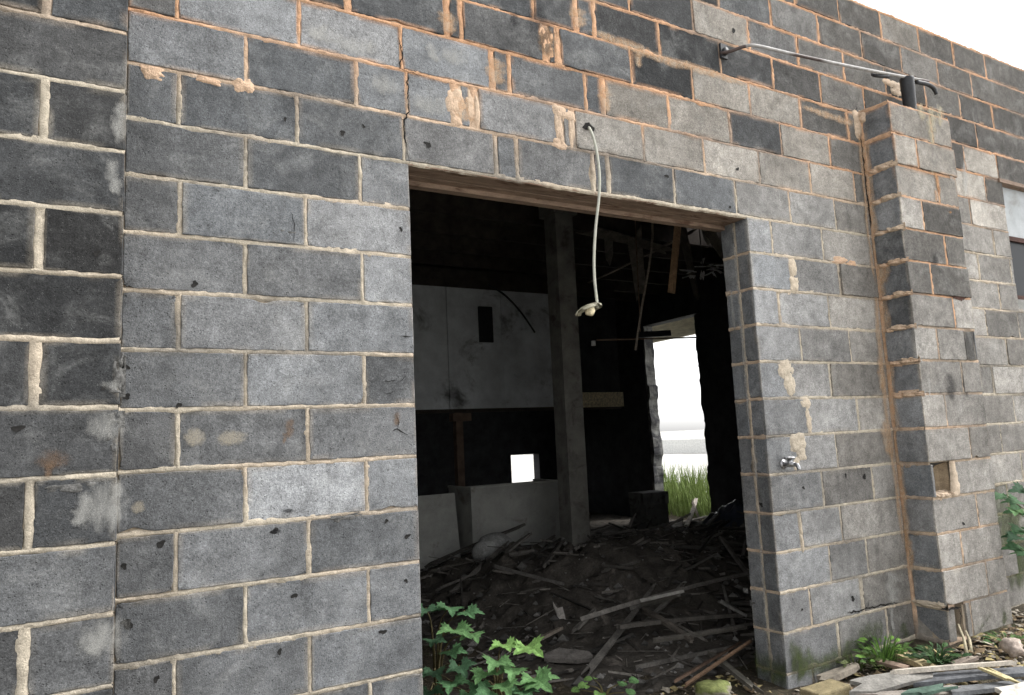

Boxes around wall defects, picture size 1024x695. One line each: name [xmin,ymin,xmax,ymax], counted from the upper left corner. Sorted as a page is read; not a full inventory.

crack [395,38,423,156]
crack [860,138,871,228]
crack [848,602,898,614]